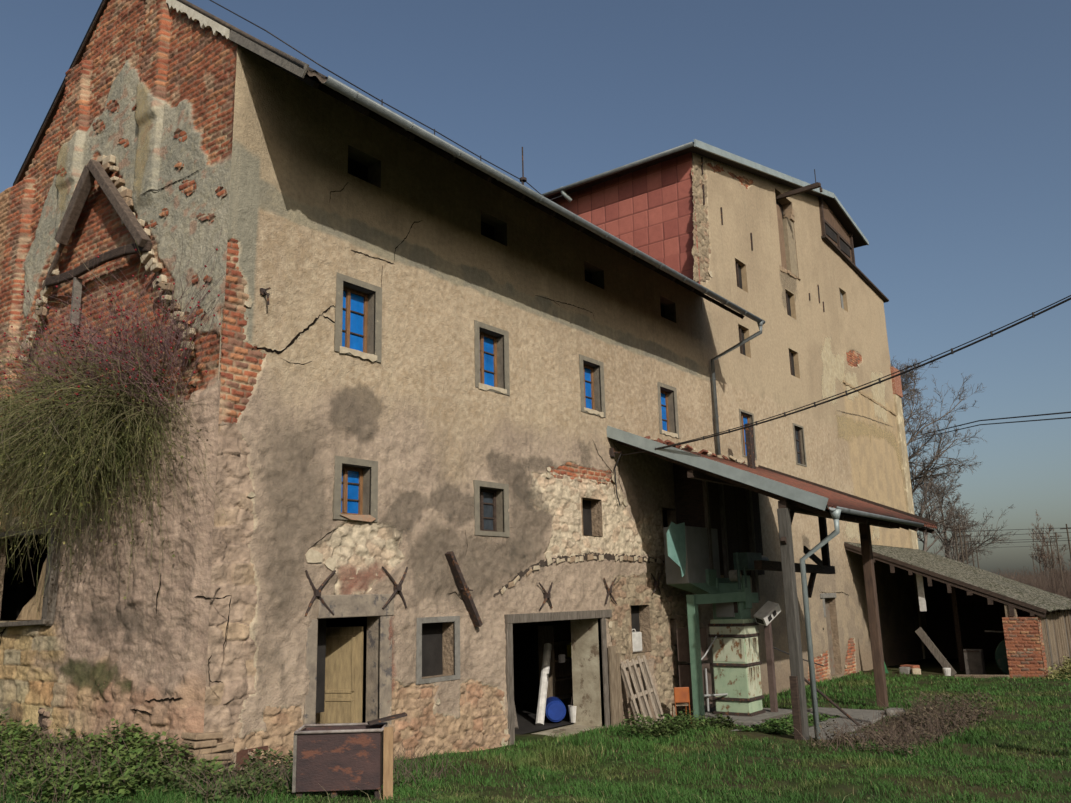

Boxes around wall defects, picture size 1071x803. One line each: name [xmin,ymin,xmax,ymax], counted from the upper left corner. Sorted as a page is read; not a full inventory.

flaking render [92,100,119,134]
flaking render [173,128,187,142]
crack [141,169,201,195]
flaking render [86,138,206,350]
crack [352,220,422,287]
flaking render [691,160,754,282]
flaking render [19,228,75,361]
crack [252,305,344,365]
peeling [821,338,862,404]
flaking render [305,521,404,595]
flaking render [493,462,693,715]
flaking render [389,657,510,760]